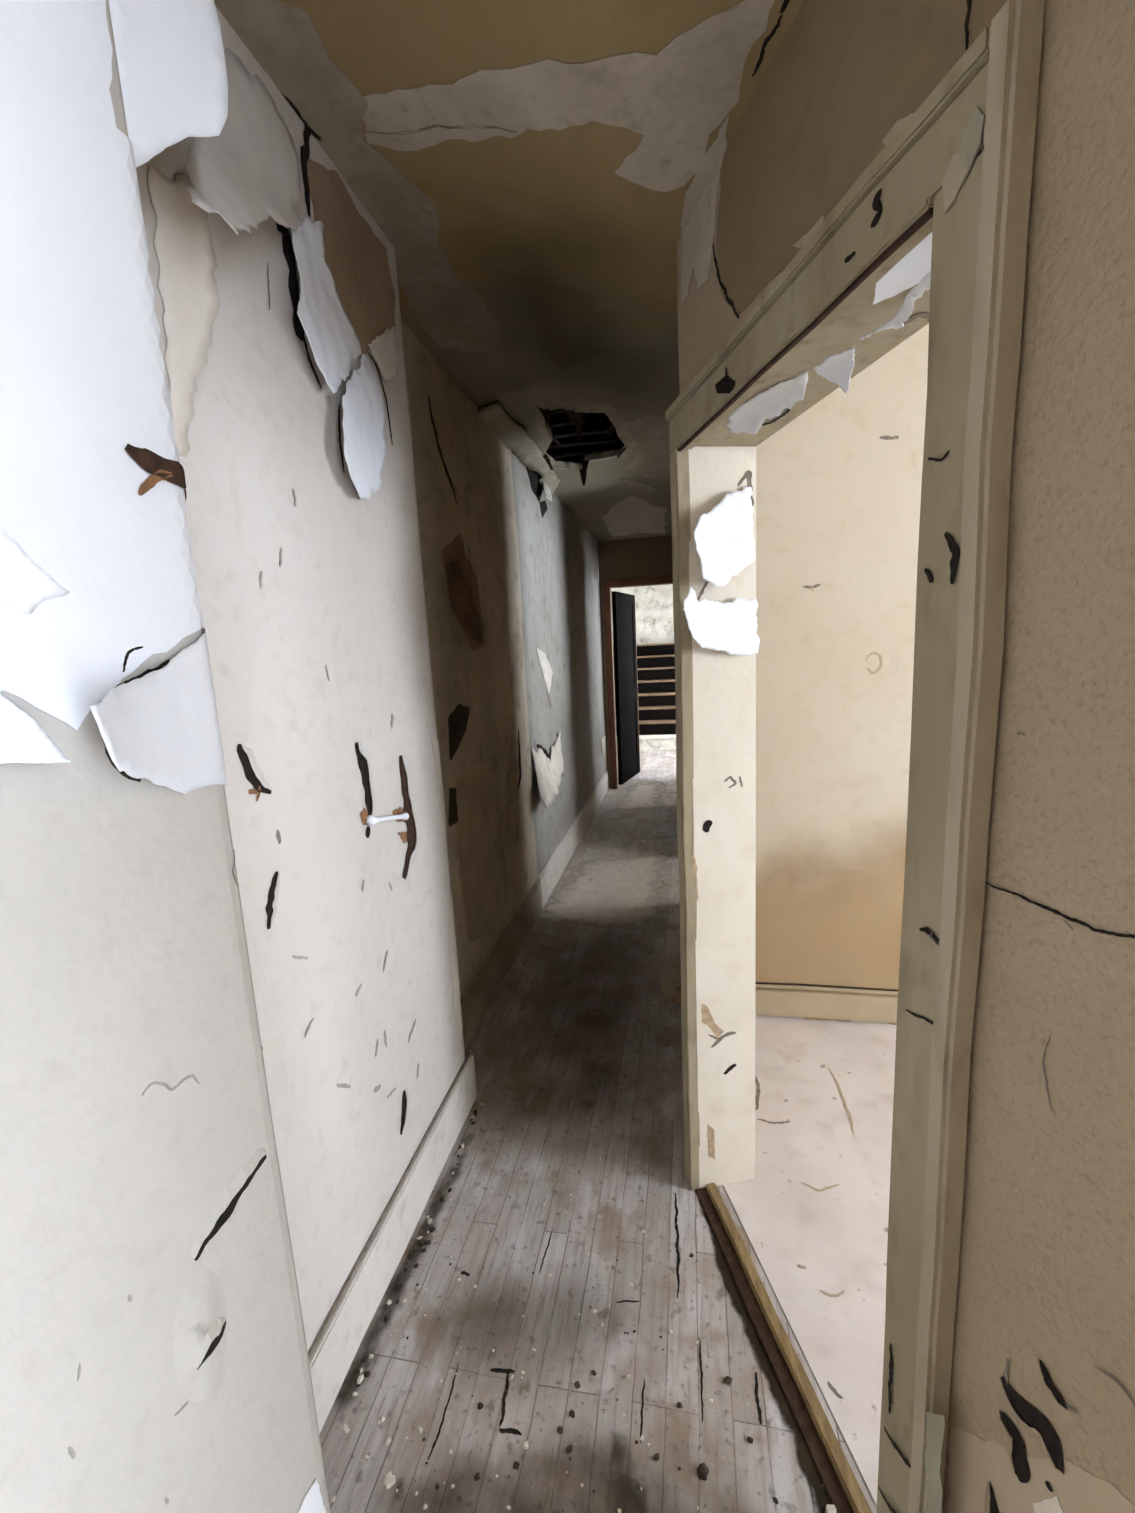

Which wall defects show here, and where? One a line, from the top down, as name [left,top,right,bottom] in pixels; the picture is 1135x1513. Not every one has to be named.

crack [752,0,790,77]
peeling [0,0,1008,795]
crack [232,744,281,929]
peeling [430,704,564,1038]
crack [985,882,1135,942]
crack [984,1482,998,1513]
peeling [924,1357,1135,1513]
crack [1037,1359,1077,1412]